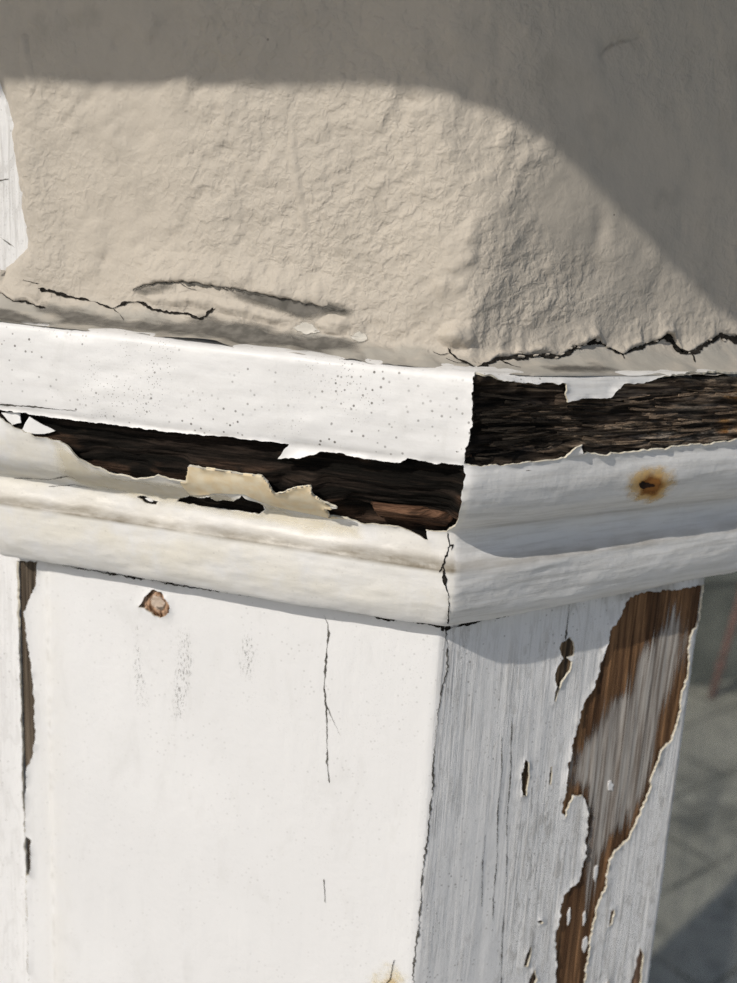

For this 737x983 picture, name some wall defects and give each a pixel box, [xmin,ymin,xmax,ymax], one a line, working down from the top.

crack [0,251,347,320]
crack [434,310,737,367]
peeling [2,412,55,434]
peeling [180,467,347,519]
corrosion [631,468,673,500]
crack [63,565,219,592]
spalling [140,589,170,617]
peeling [20,561,37,779]
crack [323,619,341,782]
crack [374,533,501,983]
peeling [554,585,701,983]